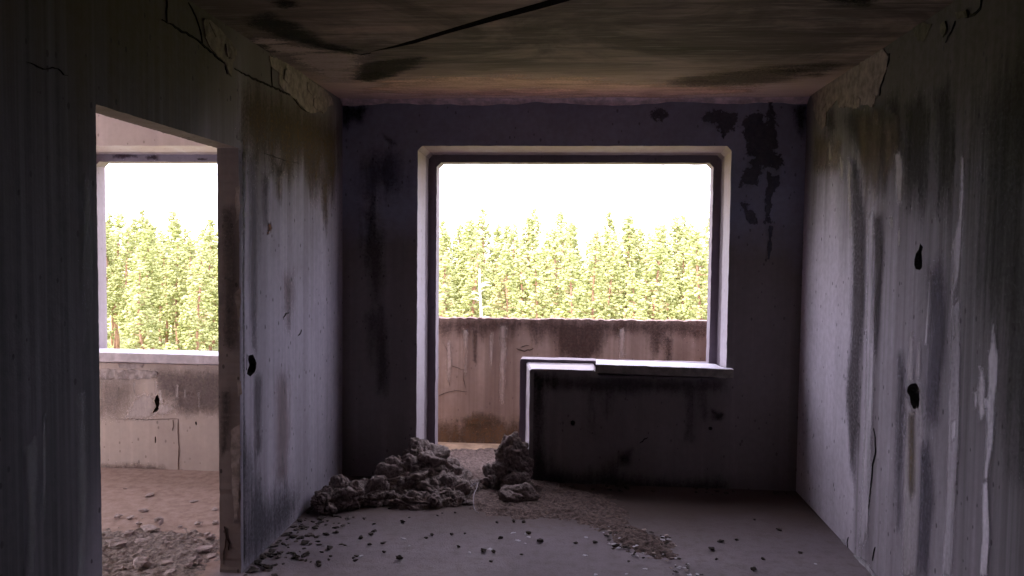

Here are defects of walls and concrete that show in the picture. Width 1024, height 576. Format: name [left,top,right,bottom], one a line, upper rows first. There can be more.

crack [162,0,305,111]
crack [314,0,570,55]
peeling [811,48,888,130]
damp [241,88,366,325]
peeling [703,102,784,261]
hole [914,244,923,270]
spalling [230,151,257,560]
damp [439,319,707,401]
crack [847,428,876,561]
damp [828,85,963,576]
hole [907,383,921,409]
efflorescence [974,325,998,576]